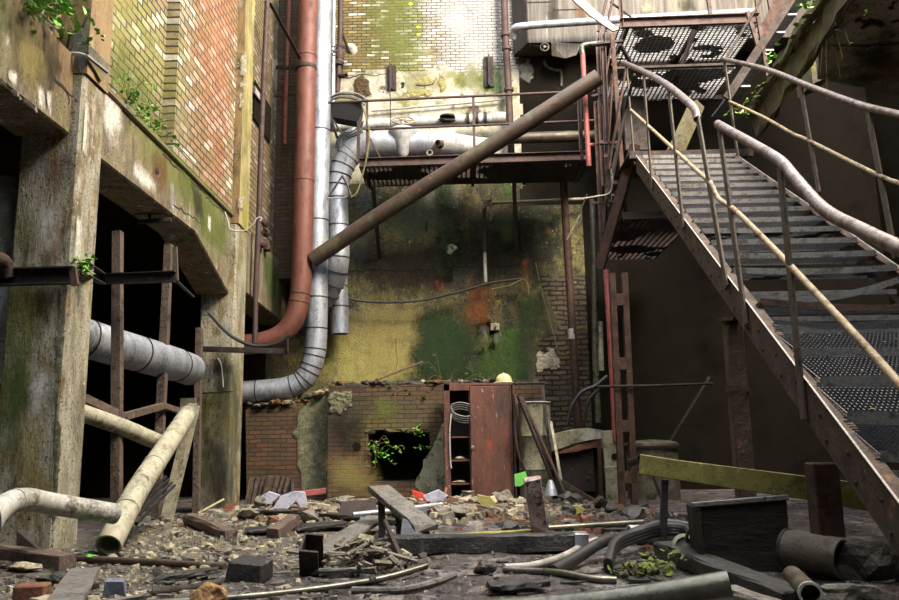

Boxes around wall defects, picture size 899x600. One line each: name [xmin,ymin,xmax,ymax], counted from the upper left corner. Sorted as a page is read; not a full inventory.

crack [830,19,899,47]
efflorescence [134,167,152,188]
water stain [193,188,211,229]
spalling [536,347,560,372]
flaking render [293,388,352,491]
flaking render [363,423,445,494]